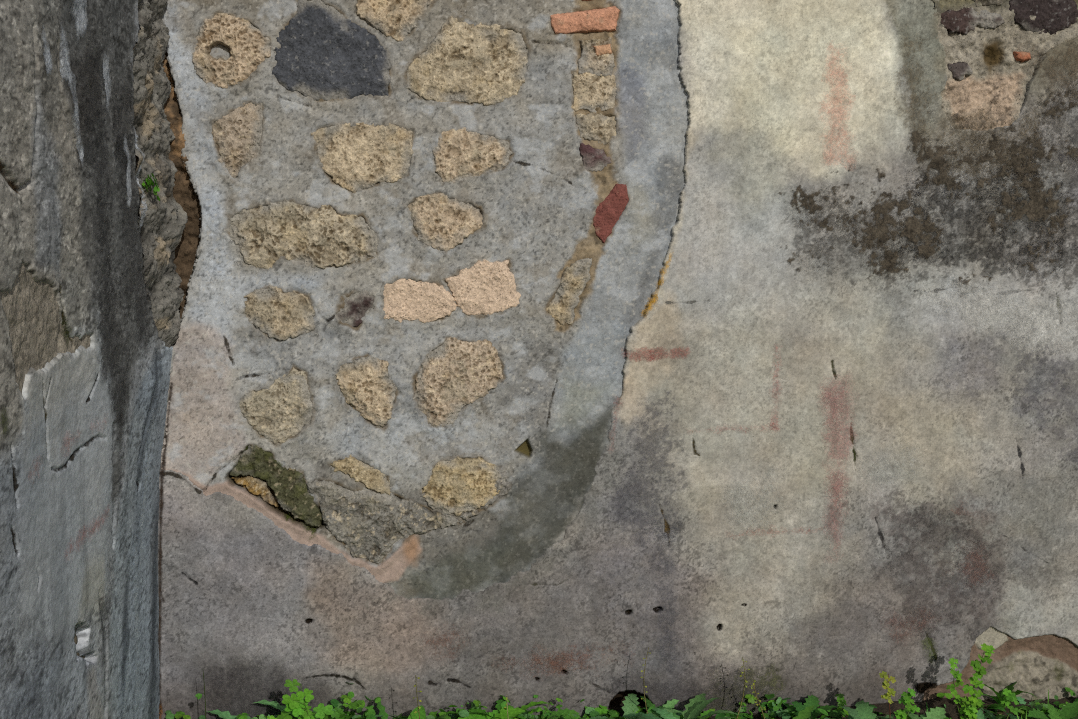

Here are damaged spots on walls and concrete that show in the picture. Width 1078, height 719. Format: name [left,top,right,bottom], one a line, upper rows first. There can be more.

damp [73,0,88,35]
flaking render [933,0,1078,131]
damp [43,30,150,440]
crack [163,47,201,318]
flaking render [132,0,689,600]
crack [55,436,102,471]
damp [137,351,162,488]
flaking render [922,626,1078,701]